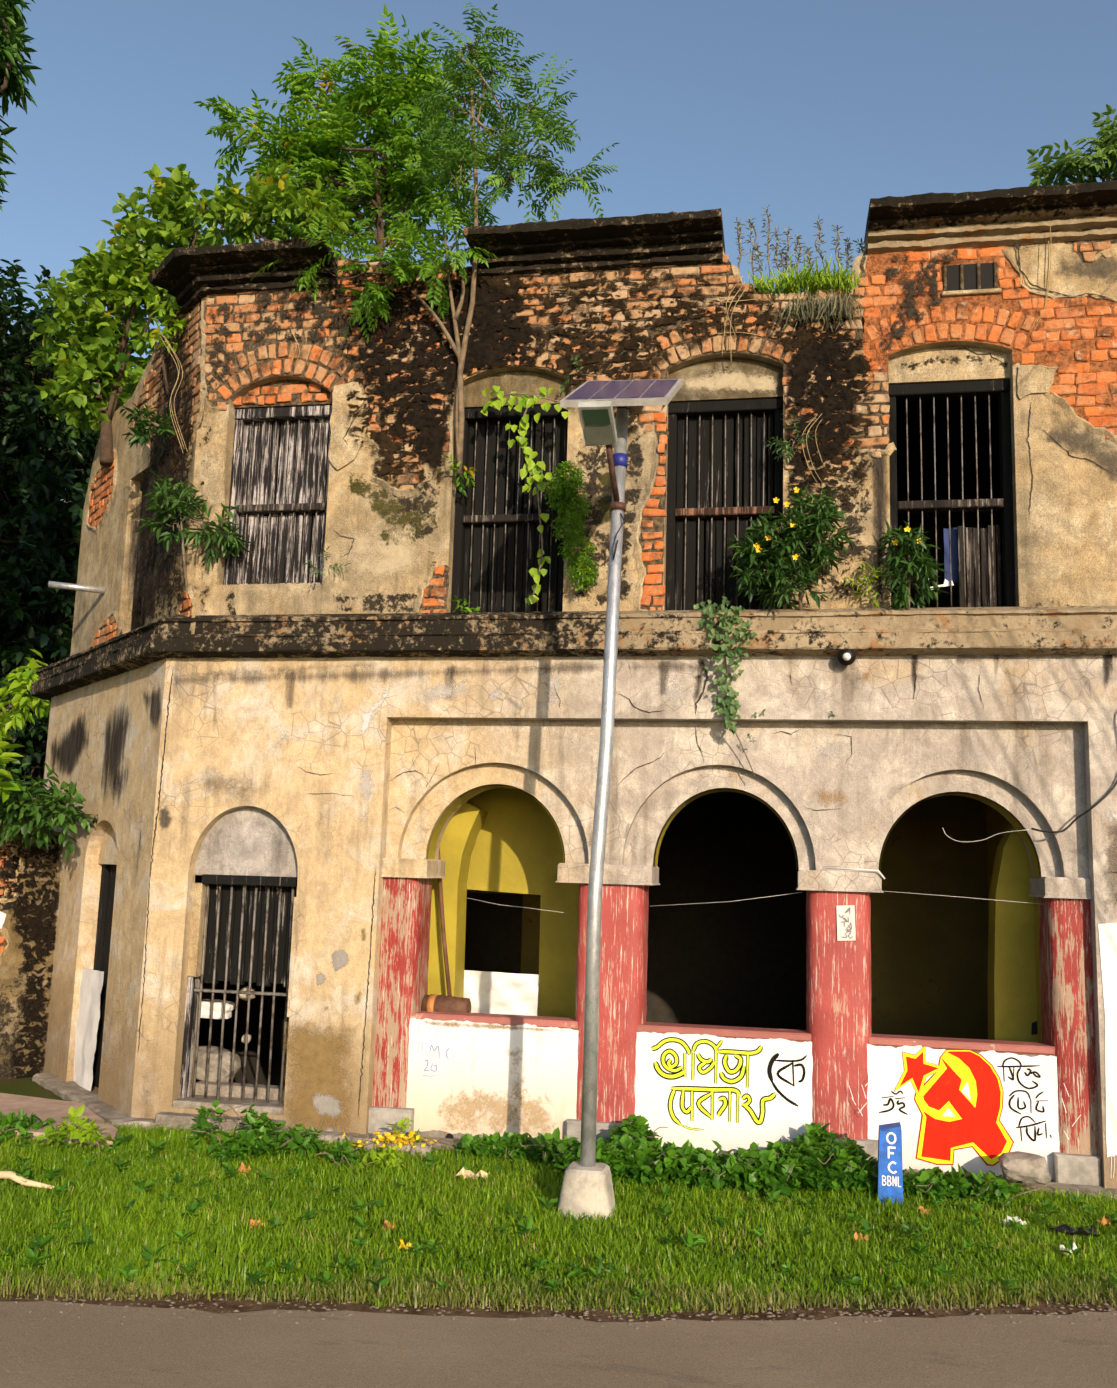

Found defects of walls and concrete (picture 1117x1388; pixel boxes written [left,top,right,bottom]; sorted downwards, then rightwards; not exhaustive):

spalling [1057,238,1117,263]
spalling [131,243,1117,544]
spalling [86,447,118,535]
spalling [613,405,669,611]
leakage [51,708,128,796]
leakage [144,690,161,726]
leakage [201,665,423,734]
leakage [545,664,590,701]
leakage [658,661,704,699]
spalling [0,830,25,965]